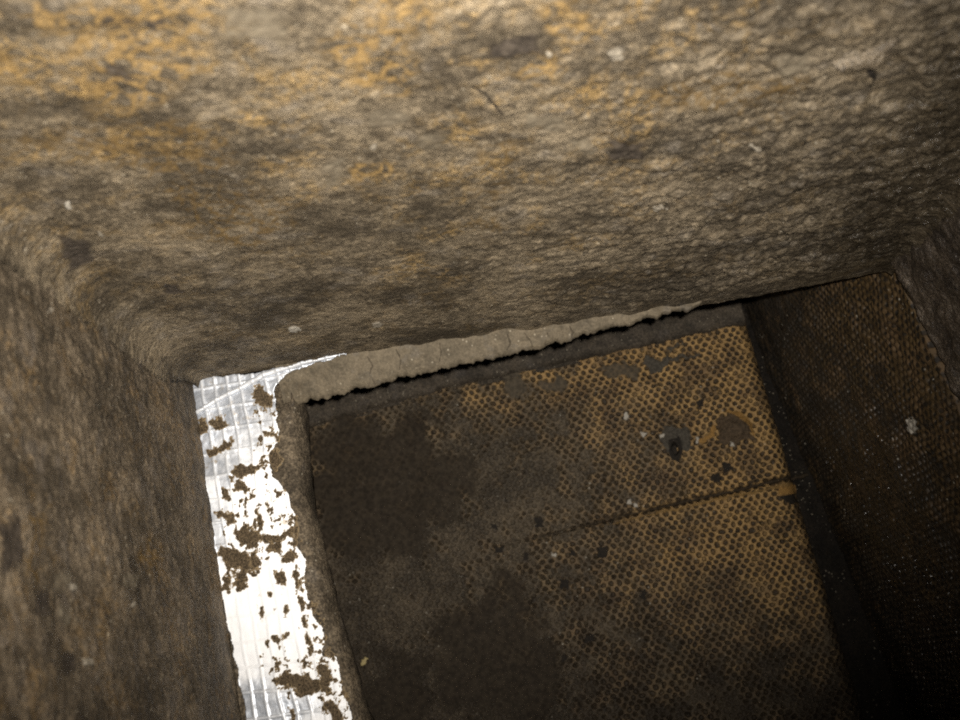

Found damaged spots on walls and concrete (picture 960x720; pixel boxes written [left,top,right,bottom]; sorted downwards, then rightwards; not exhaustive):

leakage [310,416,475,557]
leakage [364,571,558,720]